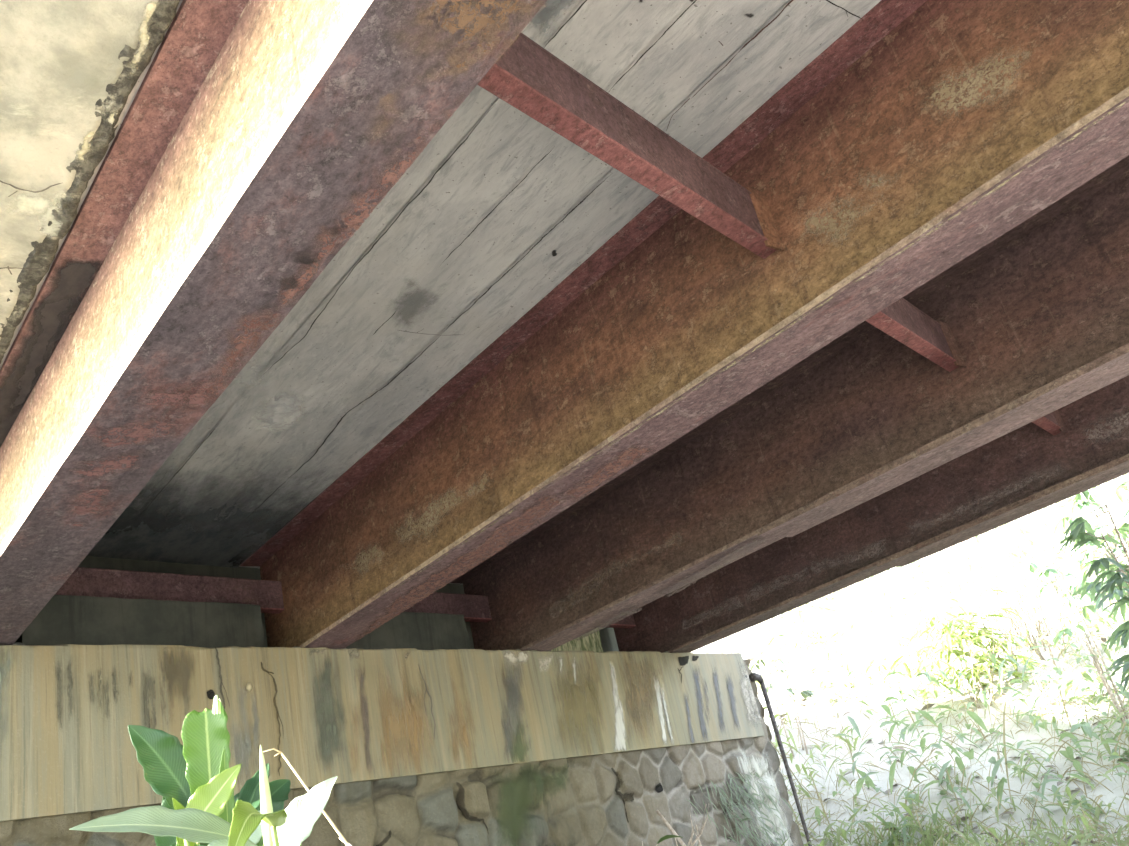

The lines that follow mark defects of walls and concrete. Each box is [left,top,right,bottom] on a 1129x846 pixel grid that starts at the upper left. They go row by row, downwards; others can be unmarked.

corrosion [420,0,540,74]
crack [0,180,61,197]
spalling [0,0,180,364]
crack [0,266,43,275]
damp [87,474,309,568]
crack [261,662,284,776]
damp [315,662,342,759]
damp [360,673,371,767]
damp [504,668,527,761]
damp [555,659,673,753]